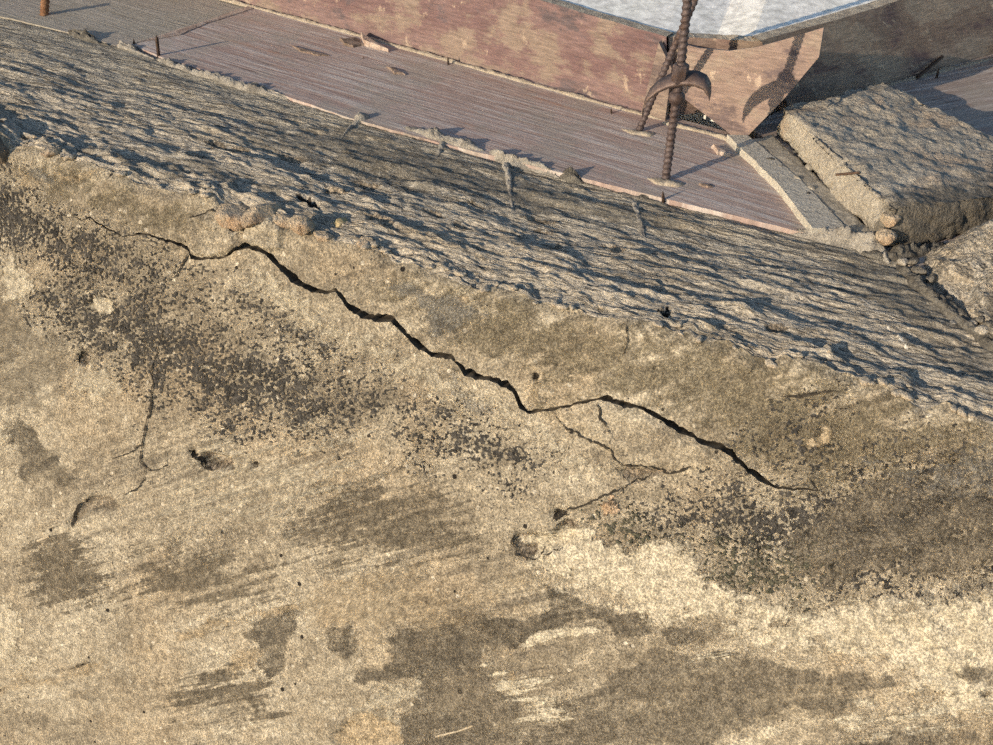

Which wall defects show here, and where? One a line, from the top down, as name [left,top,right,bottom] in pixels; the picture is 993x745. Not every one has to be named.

water stain [0,162,601,510]
crack [49,208,862,510]
spalling [764,323,789,334]
water stain [832,249,993,374]